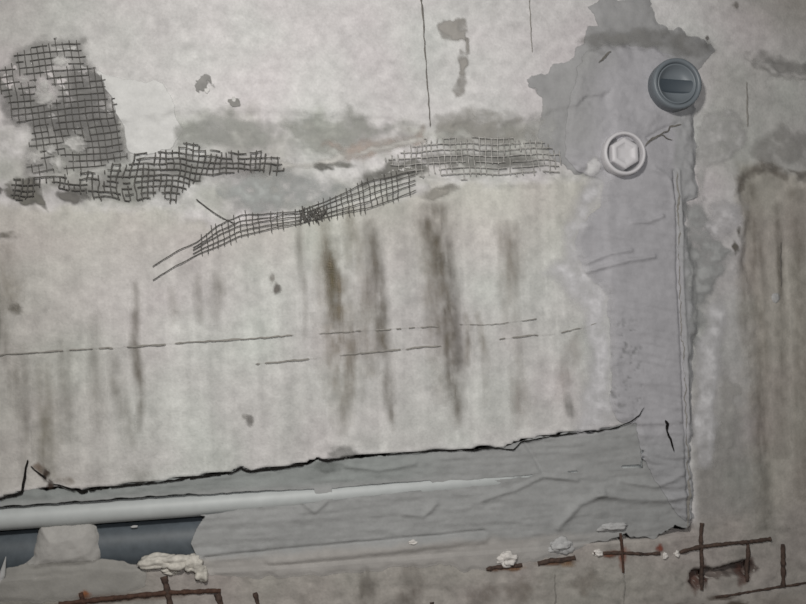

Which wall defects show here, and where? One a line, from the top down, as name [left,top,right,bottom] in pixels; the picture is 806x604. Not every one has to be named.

peeling [195,74,211,93]
crack [420,0,431,126]
peeling [438,19,469,96]
peeling [0,39,126,207]
spalling [306,133,427,170]
spalling [361,159,427,187]
spalling [427,184,454,200]
peeling [438,111,536,168]
damp [325,255,343,320]
damp [426,220,446,291]
crack [665,173,692,527]
crack [0,408,644,500]